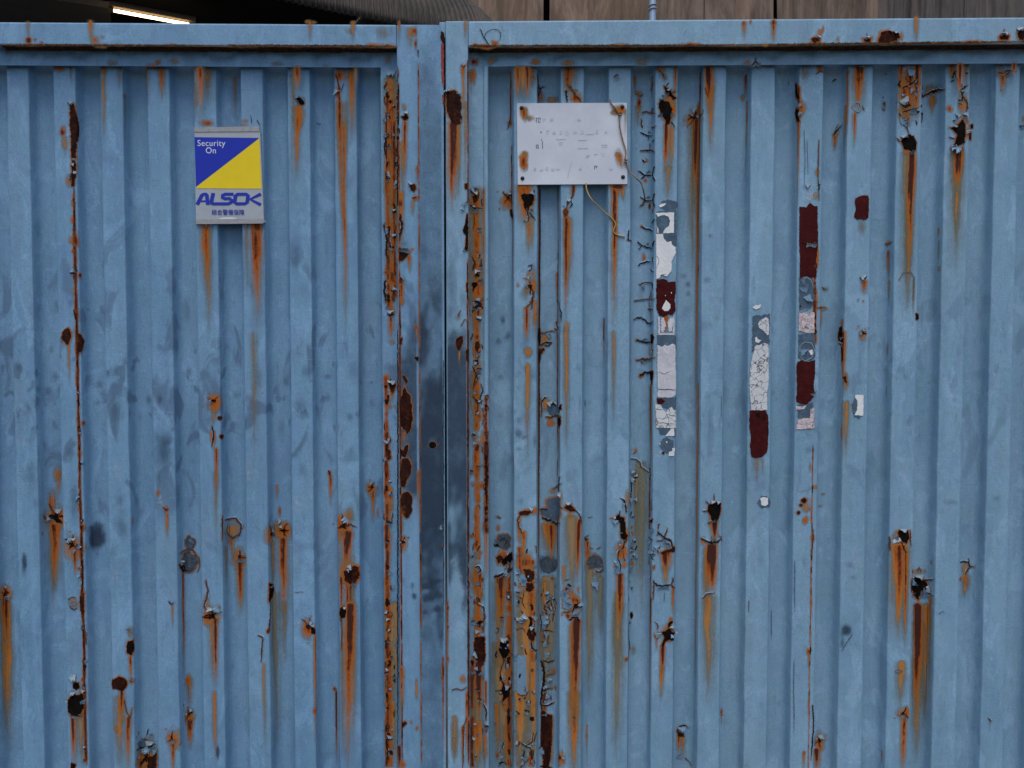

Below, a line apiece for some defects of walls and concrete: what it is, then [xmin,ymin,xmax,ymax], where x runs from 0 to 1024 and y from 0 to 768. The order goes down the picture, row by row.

corrosion [64,188,88,768]
corrosion [0,20,397,122]
corrosion [339,564,361,619]
corrosion [383,66,406,768]
corrosion [417,146,675,768]
corrosion [690,66,714,370]
corrosion [695,383,722,646]
corrosion [445,16,1024,204]
peeling [798,334,815,361]
peeling [799,277,815,312]
corrosion [886,134,917,297]
corrosion [948,63,973,243]